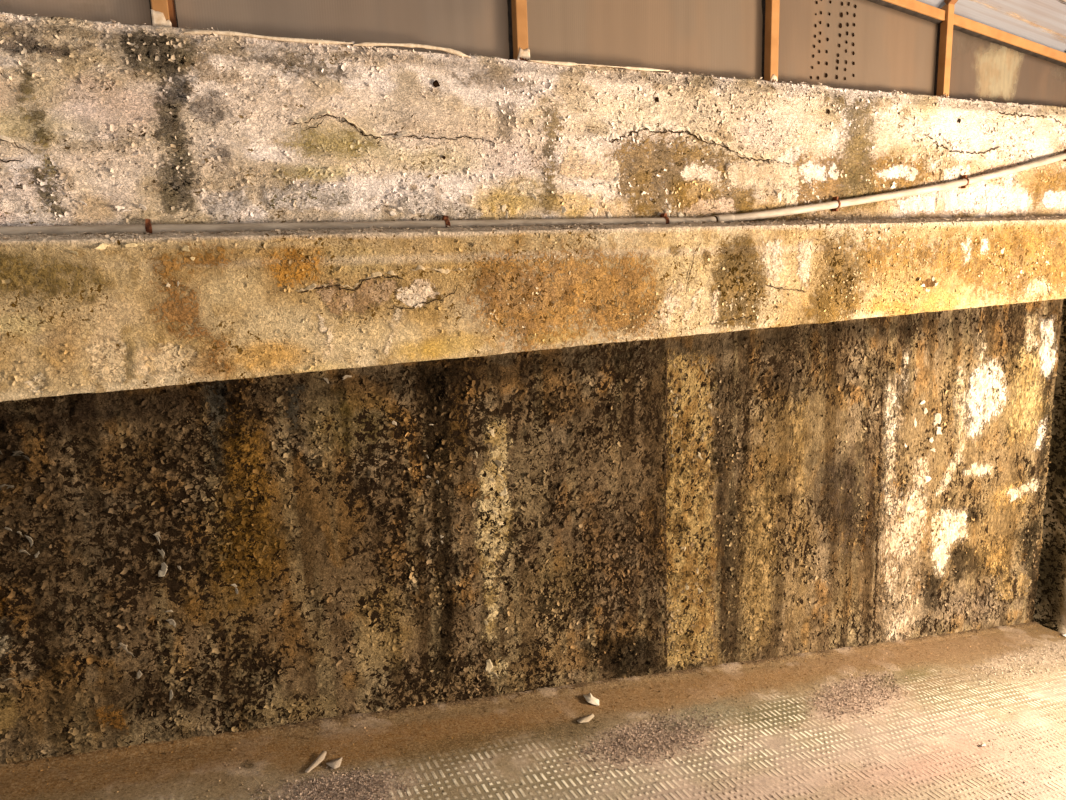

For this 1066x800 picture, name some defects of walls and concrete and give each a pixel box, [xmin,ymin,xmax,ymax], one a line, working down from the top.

peeling [0,12,256,101]
damp [0,29,353,216]
crack [291,114,499,144]
crack [606,129,788,165]
crack [298,275,403,300]
crack [384,285,458,321]
damp [703,234,771,330]
spalling [57,338,136,391]
peeling [79,39,1066,706]
damp [714,363,809,658]
damp [821,352,930,593]
peeling [0,400,307,764]